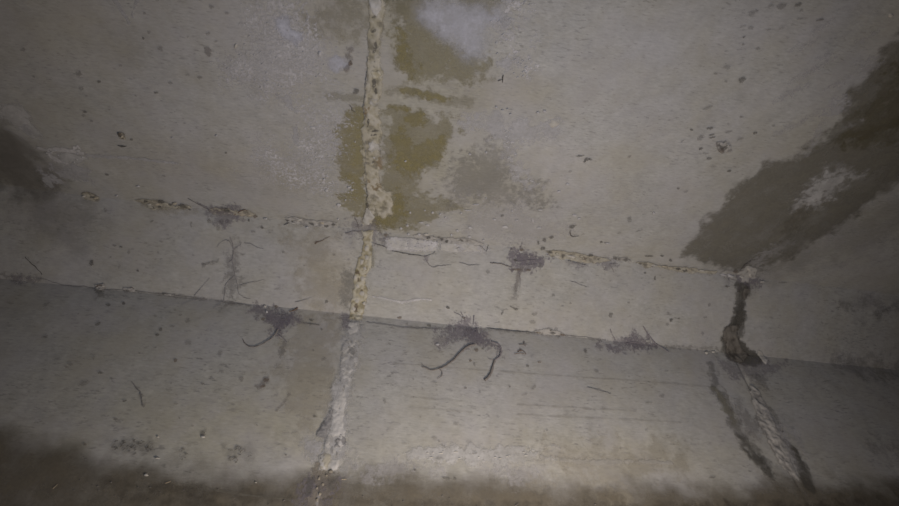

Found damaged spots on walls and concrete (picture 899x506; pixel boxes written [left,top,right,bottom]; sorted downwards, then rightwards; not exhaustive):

water stain [209,0,560,230]
water stain [681,42,899,269]
water stain [705,283,768,367]